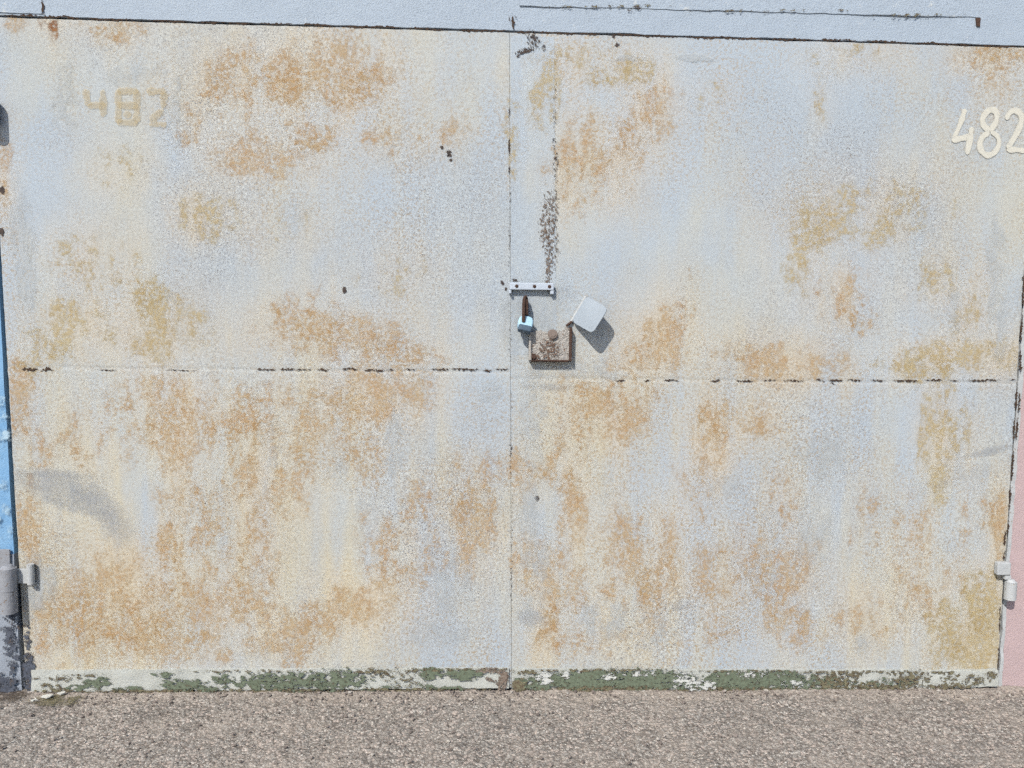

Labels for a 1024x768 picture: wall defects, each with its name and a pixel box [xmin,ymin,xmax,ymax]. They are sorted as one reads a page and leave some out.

corrosion [202,39,384,104]
corrosion [785,186,859,283]
corrosion [274,309,431,423]
corrosion [531,338,559,360]
corrosion [149,378,276,498]
corrosion [892,338,1011,503]
corrosion [35,560,273,659]
corrosion [252,523,396,665]
corrosion [912,572,1000,669]
peeling [150,665,998,693]